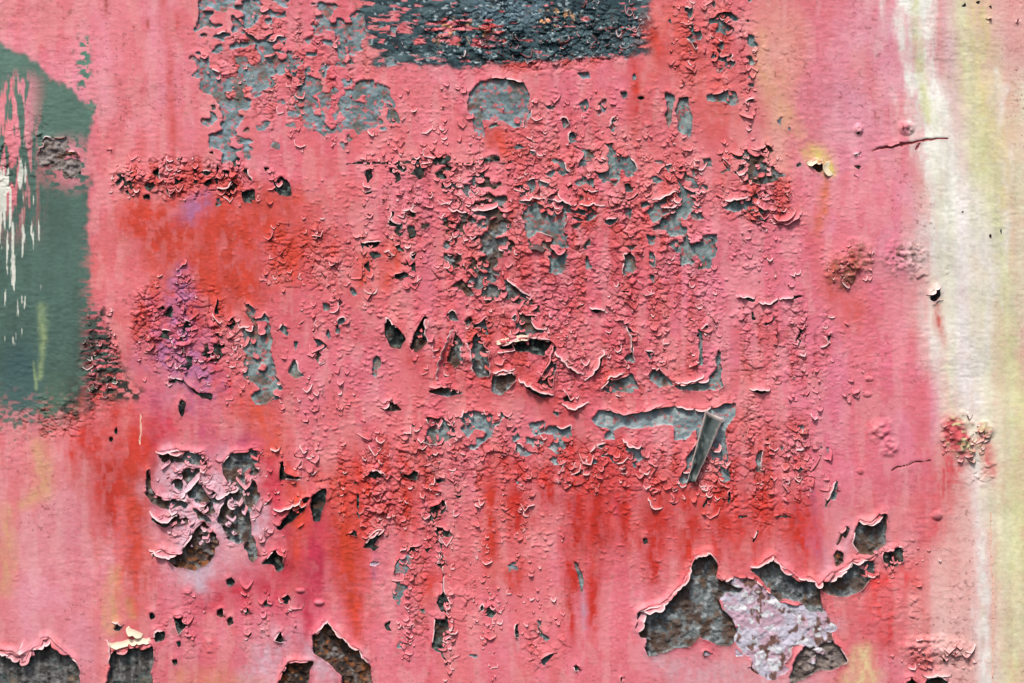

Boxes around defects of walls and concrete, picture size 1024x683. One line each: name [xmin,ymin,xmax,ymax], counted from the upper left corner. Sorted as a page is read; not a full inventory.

crack [872,138,949,152]
rust [90,0,455,677]
peeling [104,0,803,683]
rust [463,249,544,304]
rust [395,335,828,662]
peeling [0,637,82,683]
peeling [636,510,942,683]